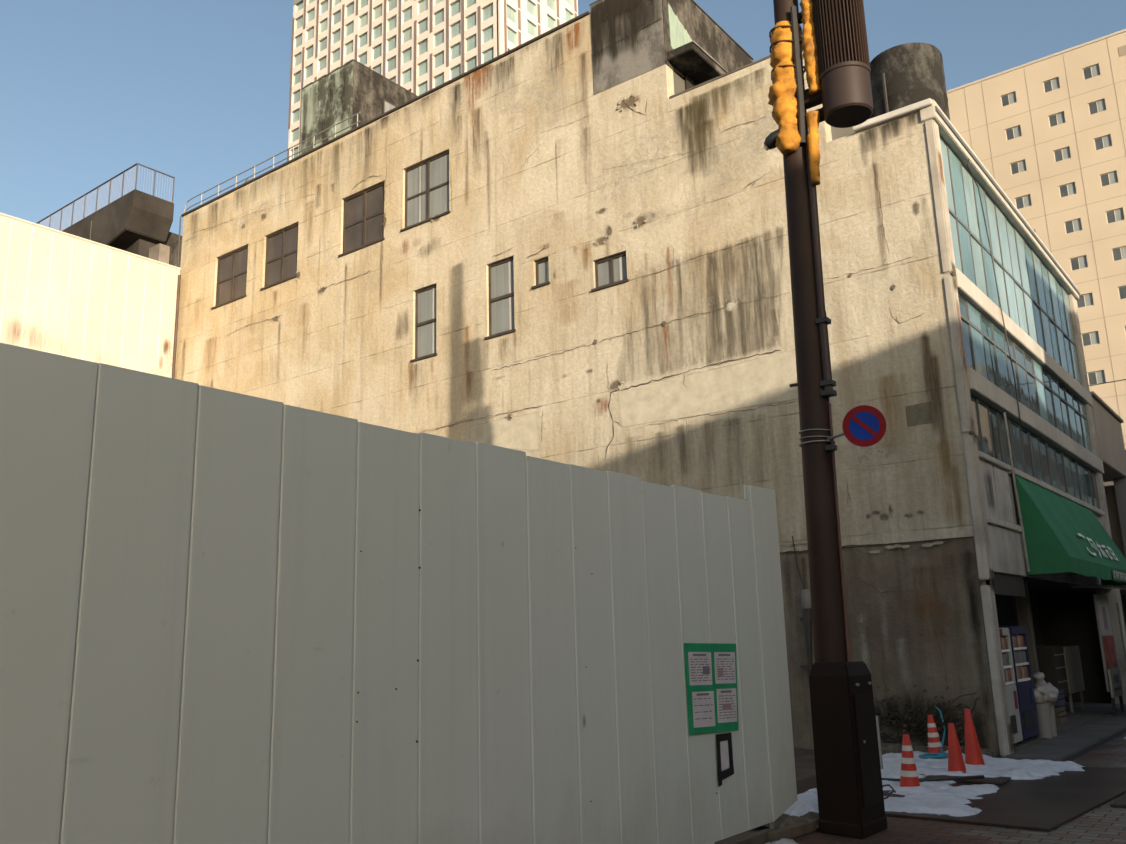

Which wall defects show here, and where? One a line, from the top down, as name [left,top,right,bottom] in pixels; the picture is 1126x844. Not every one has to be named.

water stain [680,78,740,170]
water stain [707,230,782,362]
crack [491,297,796,458]
water stain [922,334,947,462]